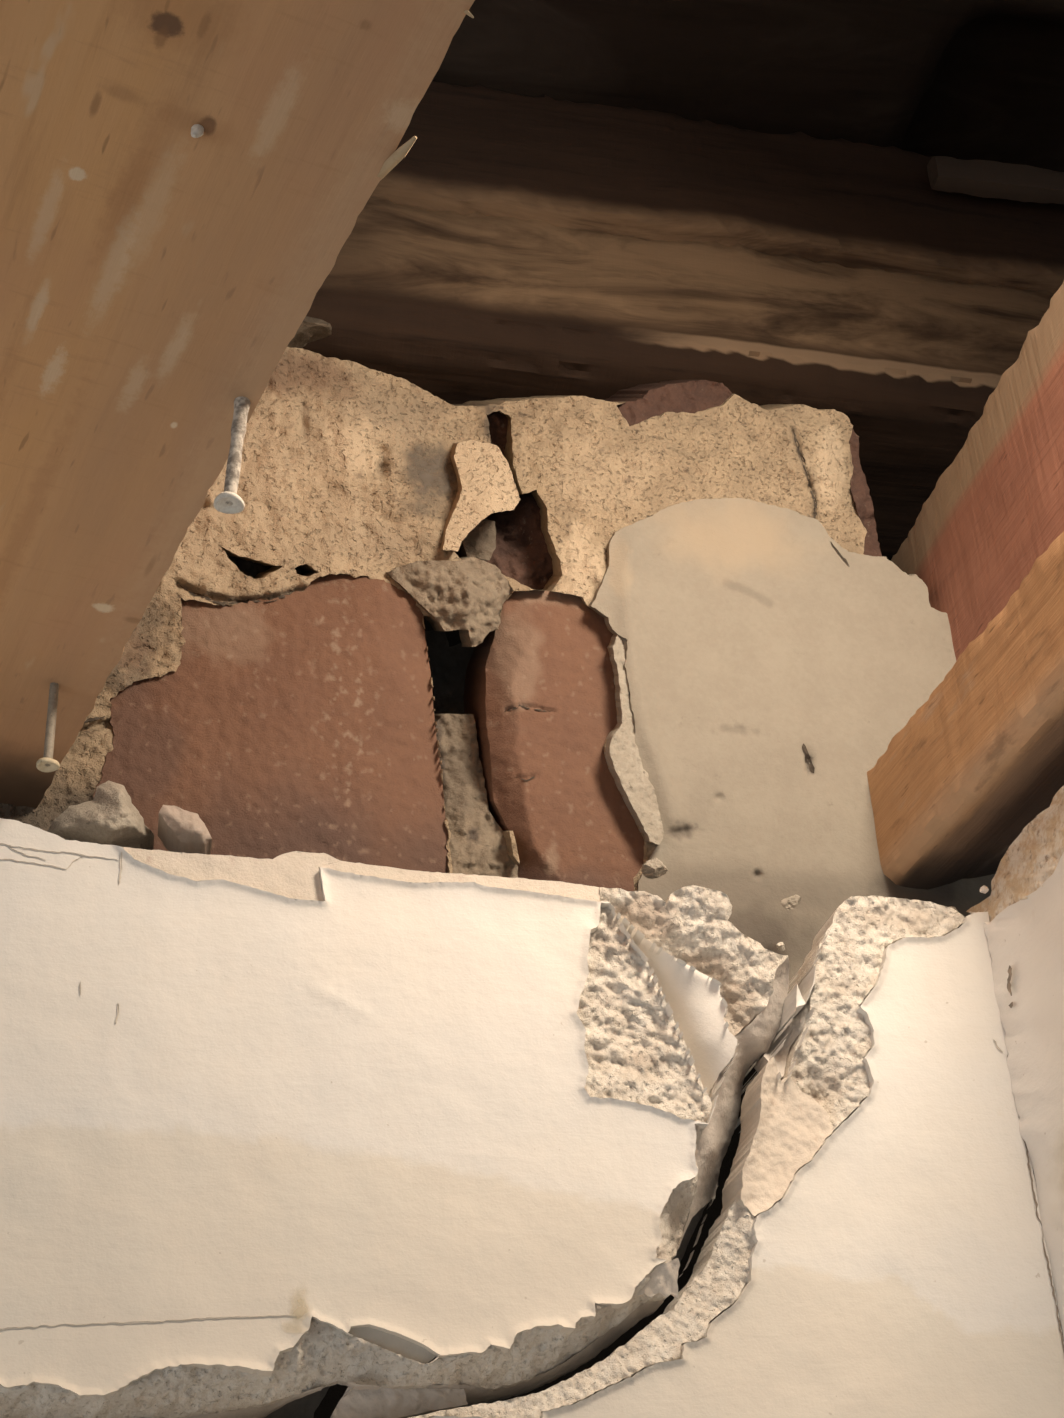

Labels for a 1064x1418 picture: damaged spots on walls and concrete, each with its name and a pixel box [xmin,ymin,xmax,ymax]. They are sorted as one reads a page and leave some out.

crack [0,843,122,884]
flaking render [122,498,1064,1218]
crack [0,956,790,1418]